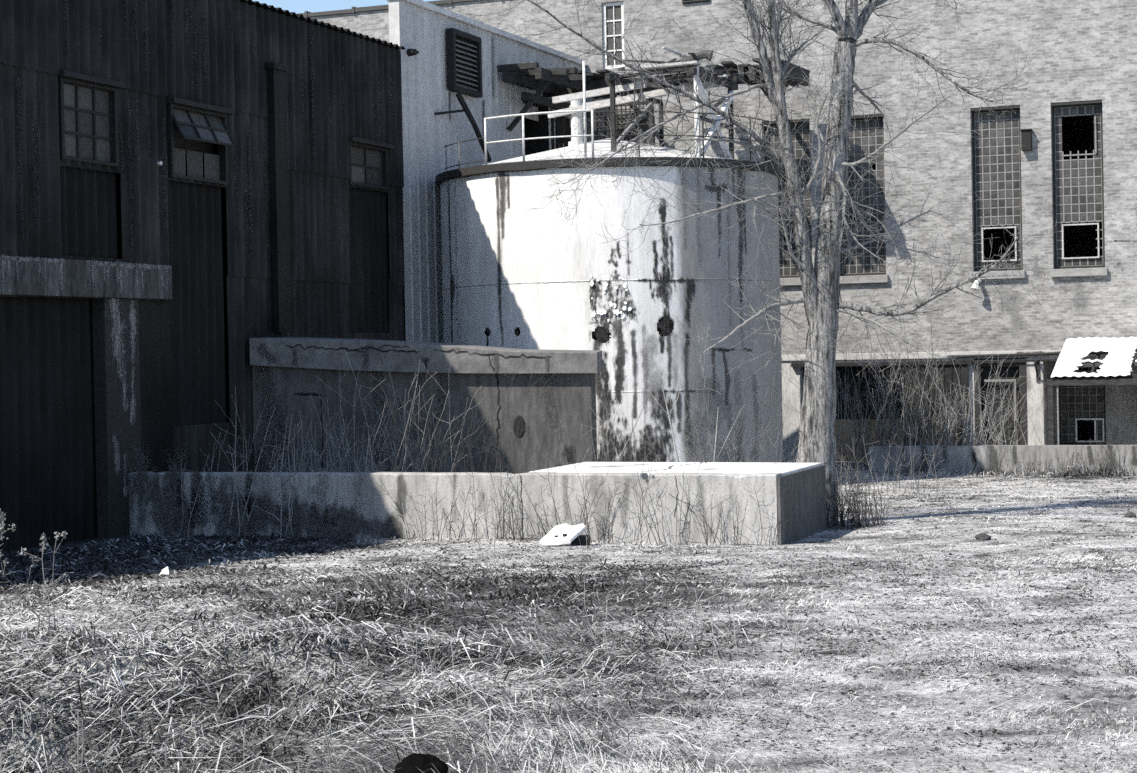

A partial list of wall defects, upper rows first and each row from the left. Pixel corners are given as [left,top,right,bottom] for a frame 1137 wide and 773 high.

crack [286,344,552,471]
rust [597,198,695,462]